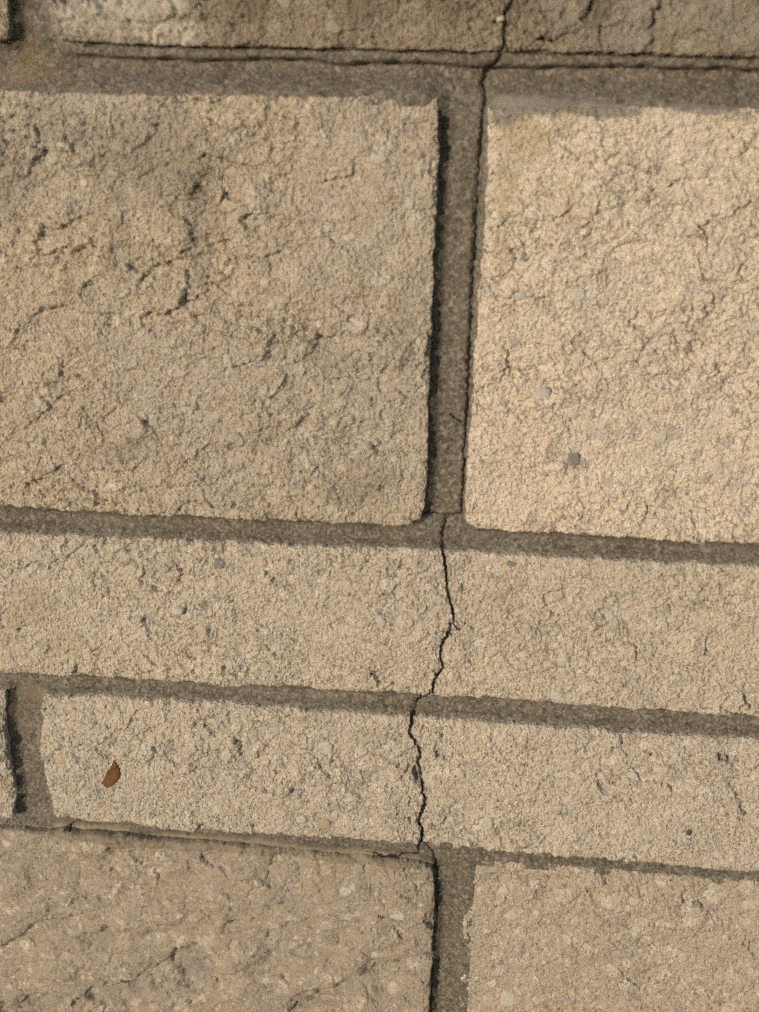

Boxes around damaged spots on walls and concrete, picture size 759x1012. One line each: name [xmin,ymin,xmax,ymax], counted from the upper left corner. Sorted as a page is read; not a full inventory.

crack [366,0,759,1012]